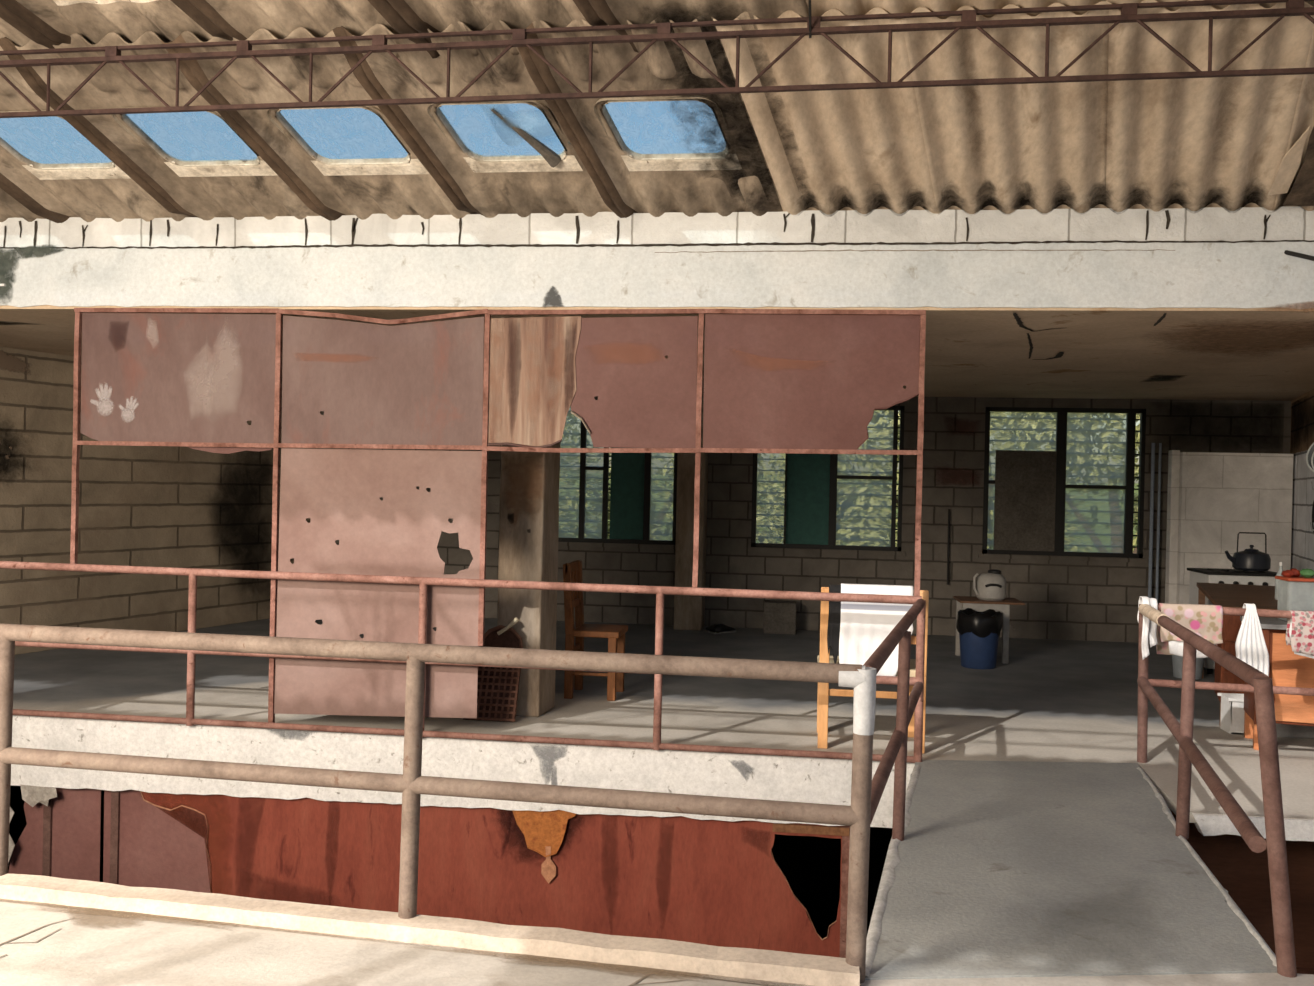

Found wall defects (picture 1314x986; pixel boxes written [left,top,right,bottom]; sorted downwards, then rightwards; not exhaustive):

leakage [643,4,778,196]
peeling [1268,126,1310,196]
leakage [0,245,62,299]
crack [1013,313,1064,360]
corrosion [141,791,402,912]
corrosion [417,806,842,957]